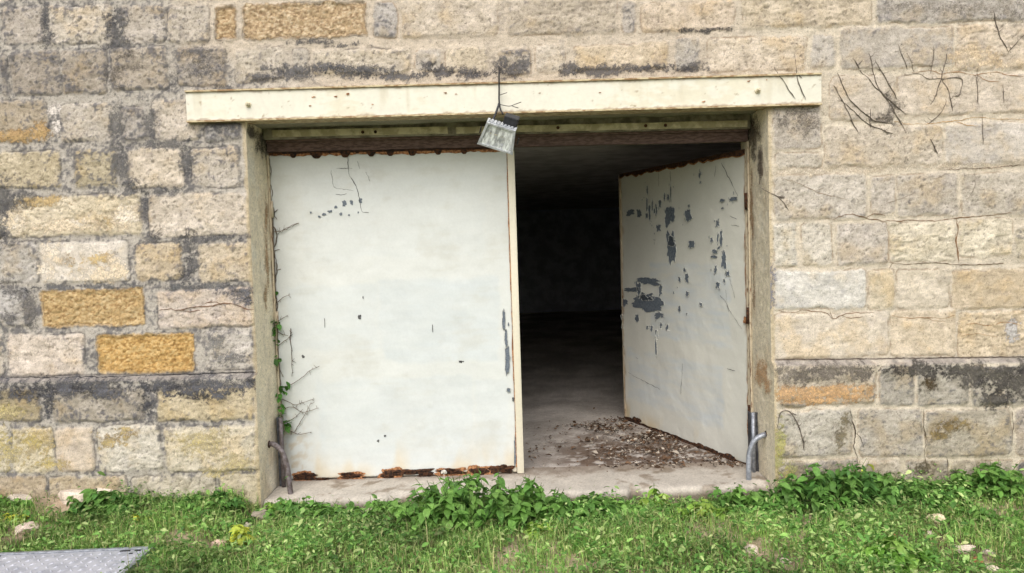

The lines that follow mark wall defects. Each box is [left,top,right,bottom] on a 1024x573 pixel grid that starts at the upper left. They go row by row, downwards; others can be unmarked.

damp [246,56,532,85]
damp [559,61,710,78]
crack [912,70,1023,82]
crack [894,117,1024,126]
crack [161,158,299,312]
peeling [620,184,703,358]
peeling [709,191,738,290]
crack [781,165,1017,267]
damp [0,331,257,419]
peeling [502,308,514,402]
damp [774,358,1024,411]
rust [291,415,517,481]